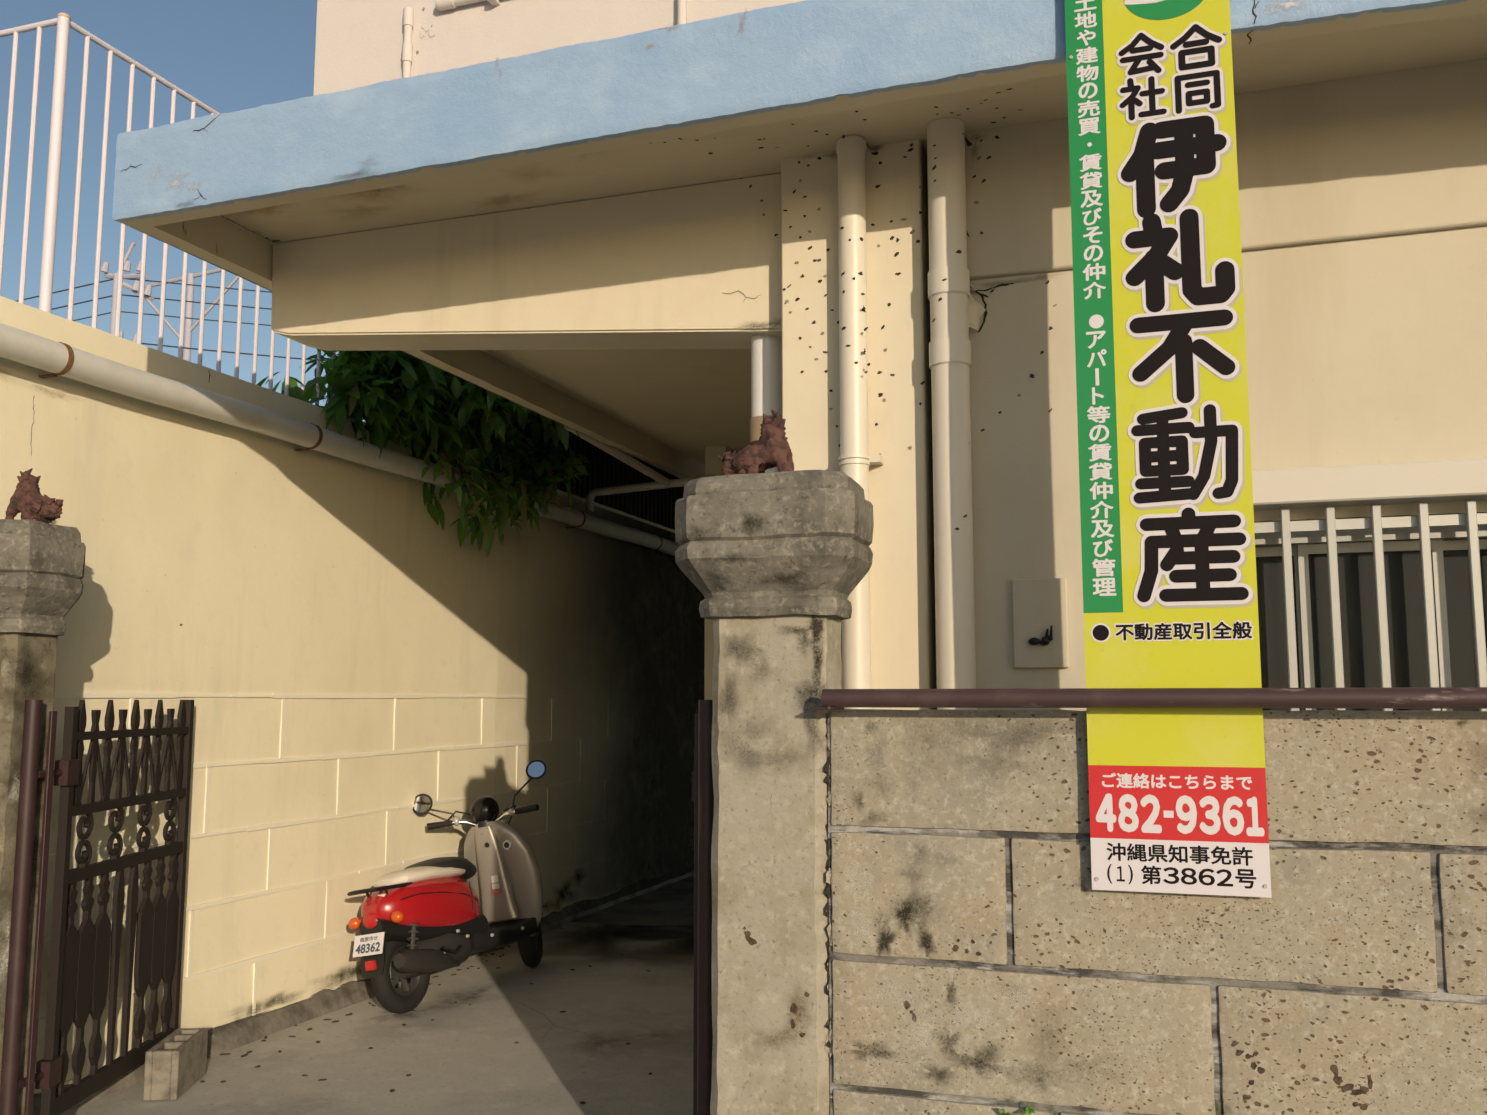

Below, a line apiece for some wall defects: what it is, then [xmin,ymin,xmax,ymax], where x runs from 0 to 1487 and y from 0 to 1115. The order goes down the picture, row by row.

crack [970,283,1013,333]
water stain [793,616,822,710]
water stain [878,902,933,953]